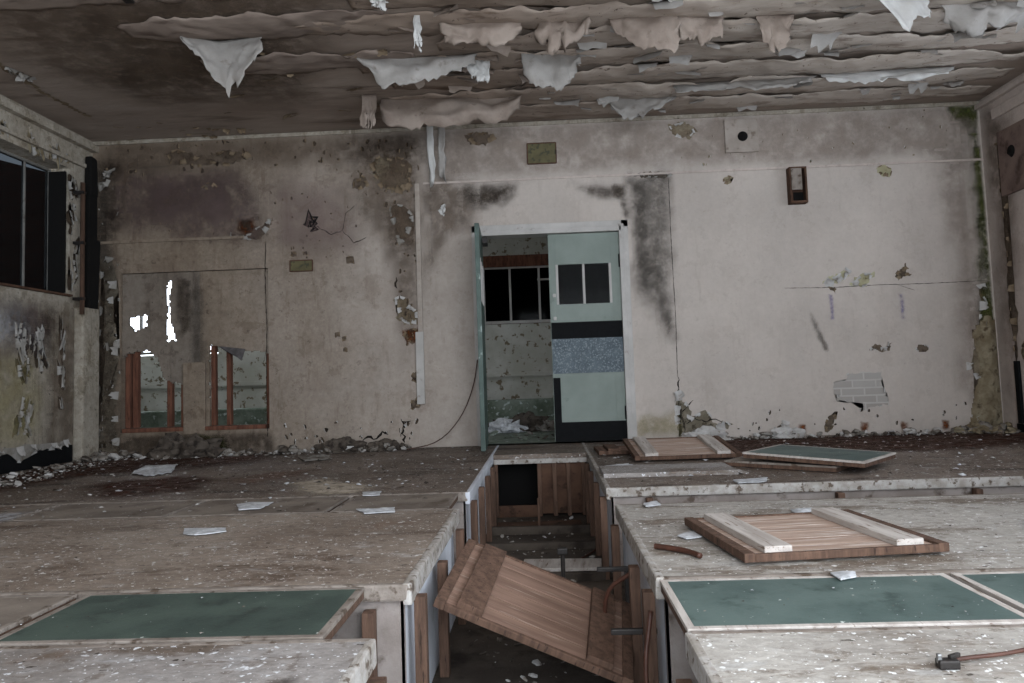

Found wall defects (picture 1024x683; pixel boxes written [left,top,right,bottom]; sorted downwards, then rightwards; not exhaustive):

peeling [179,36,265,98]
water stain [0,146,271,497]
spalling [0,256,488,531]
water stain [588,176,667,304]
spalling [674,390,790,483]
flaking render [802,371,1024,476]
water stain [949,105,1011,321]
peeling [994,143,1024,361]